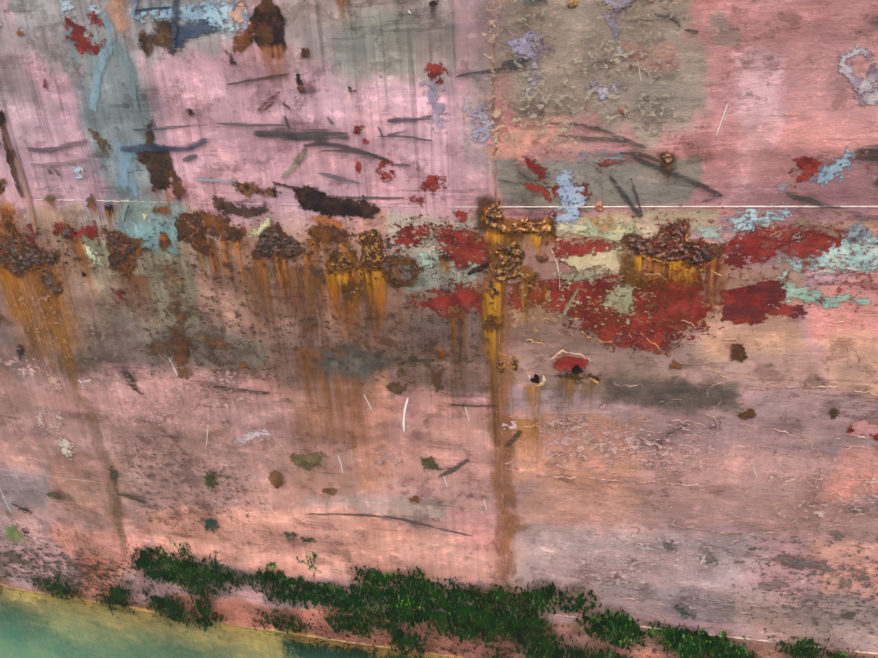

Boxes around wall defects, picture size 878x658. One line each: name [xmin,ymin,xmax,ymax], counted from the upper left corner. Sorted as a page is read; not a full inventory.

rust [224,0,287,69]
rust [0,110,37,233]
rust [0,204,77,382]
rust [84,117,424,380]
peeling [0,0,878,448]
rust [621,217,726,306]
peeling [32,406,78,460]
peeling [105,427,271,539]
rust [386,368,406,395]
rust [467,197,557,575]
peeling [0,518,153,620]
peeling [227,596,523,658]